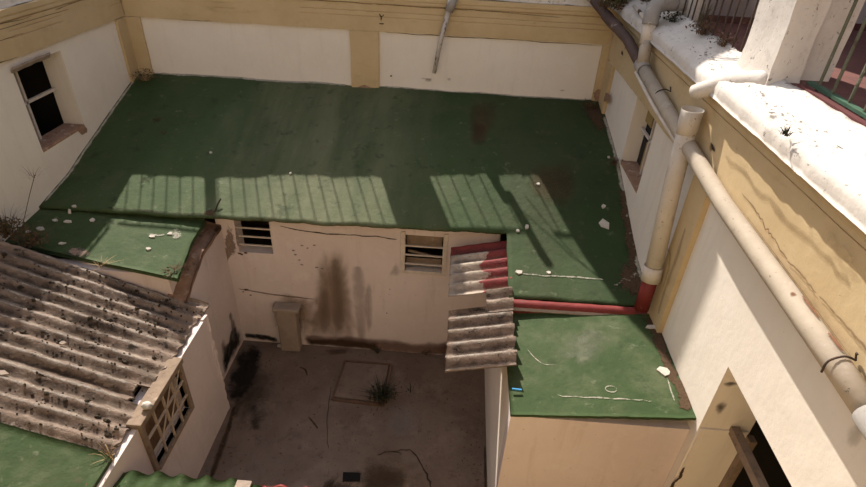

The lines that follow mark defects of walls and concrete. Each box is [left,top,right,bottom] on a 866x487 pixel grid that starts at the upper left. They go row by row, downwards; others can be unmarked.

water stain [288,267,348,326]
water stain [306,336,447,355]
water stain [210,314,277,477]